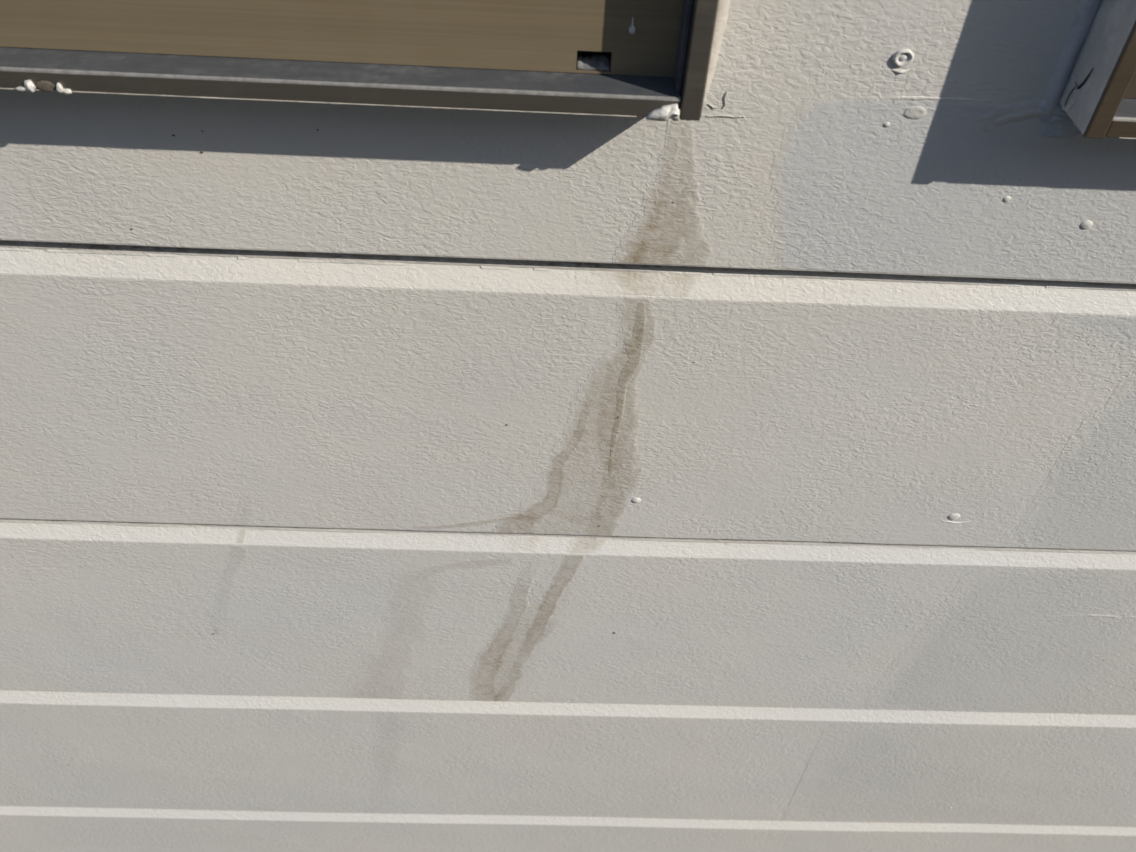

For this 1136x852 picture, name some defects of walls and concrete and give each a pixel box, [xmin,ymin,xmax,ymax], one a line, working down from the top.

damp [328,117,714,813]